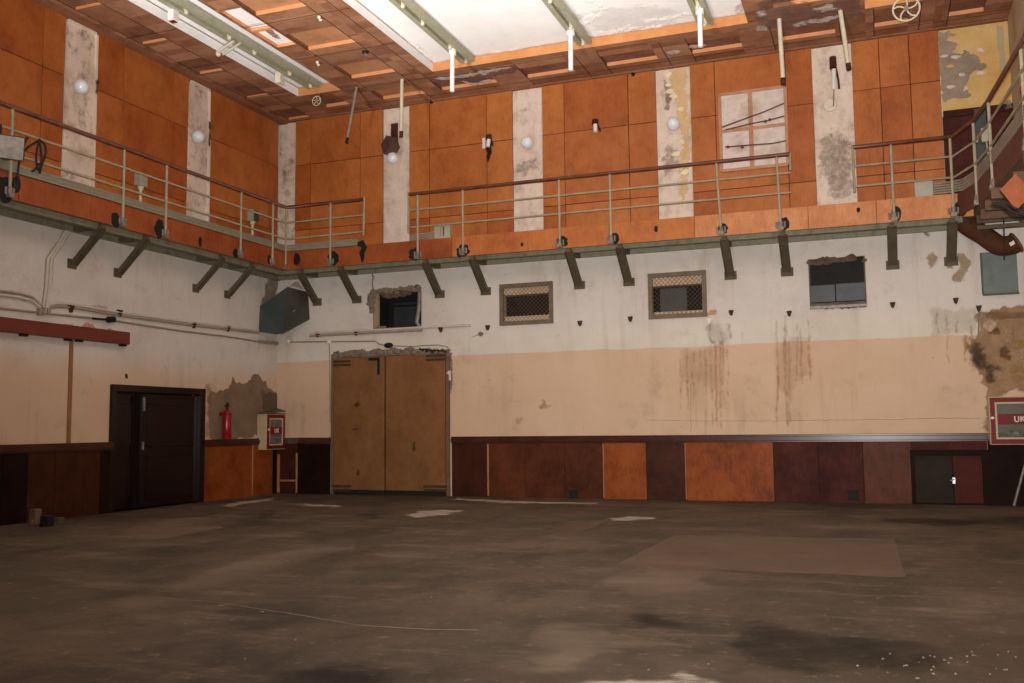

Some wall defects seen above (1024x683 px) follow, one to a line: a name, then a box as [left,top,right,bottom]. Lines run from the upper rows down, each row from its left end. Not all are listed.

peeling [938,30,987,102]
peeling [664,67,691,200]
spalling [366,284,421,313]
spalling [333,346,453,393]
peeling [208,374,277,439]